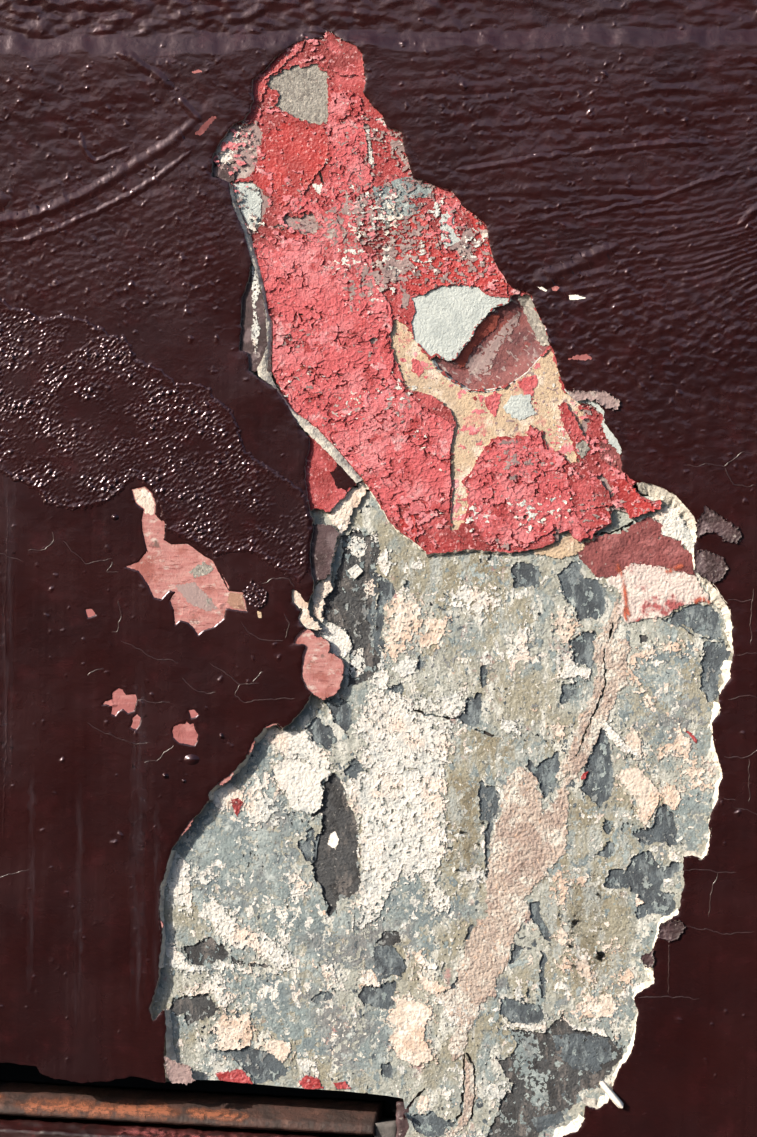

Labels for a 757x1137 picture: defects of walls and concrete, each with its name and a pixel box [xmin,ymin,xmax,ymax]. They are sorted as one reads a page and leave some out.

crack [0,532,117,573]
peeling [127,487,262,635]
spalling [151,31,742,1137]
crack [116,602,294,703]
crack [728,589,757,656]
peeling [104,688,141,729]
crack [576,623,614,756]
crack [90,724,174,763]
crack [724,750,757,815]
crack [684,869,752,935]
crack [638,947,696,1000]